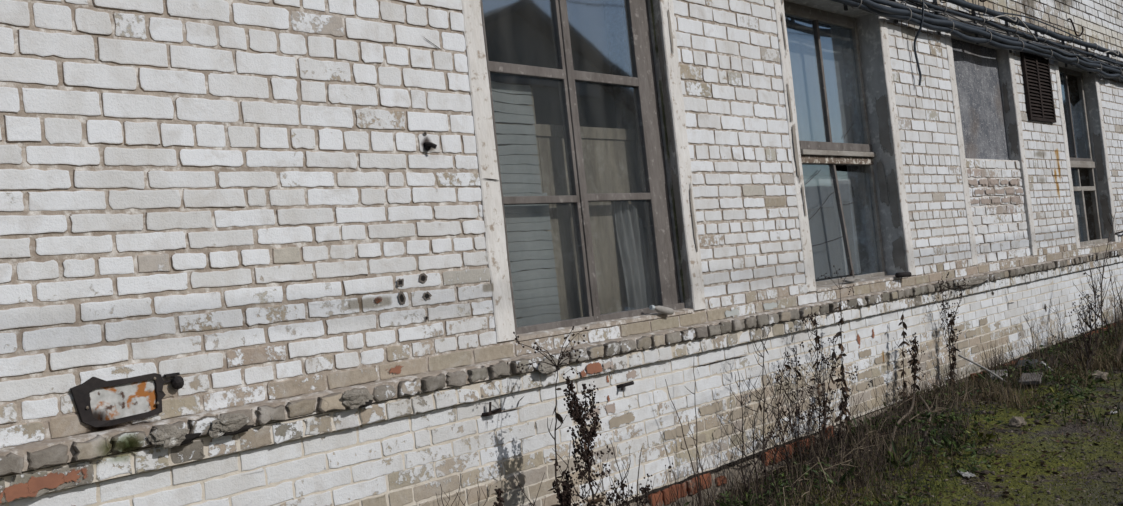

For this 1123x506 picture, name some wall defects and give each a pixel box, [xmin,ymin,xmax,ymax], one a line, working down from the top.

spalling [955,276,989,288]
spalling [538,355,560,376]
peeling [856,329,908,391]
peeling [947,317,1023,380]
spalling [342,390,374,409]
peeling [579,361,635,434]
spalling [147,413,254,449]
peeling [664,390,766,449]
peeling [0,468,88,505]
flaking render [647,473,727,506]